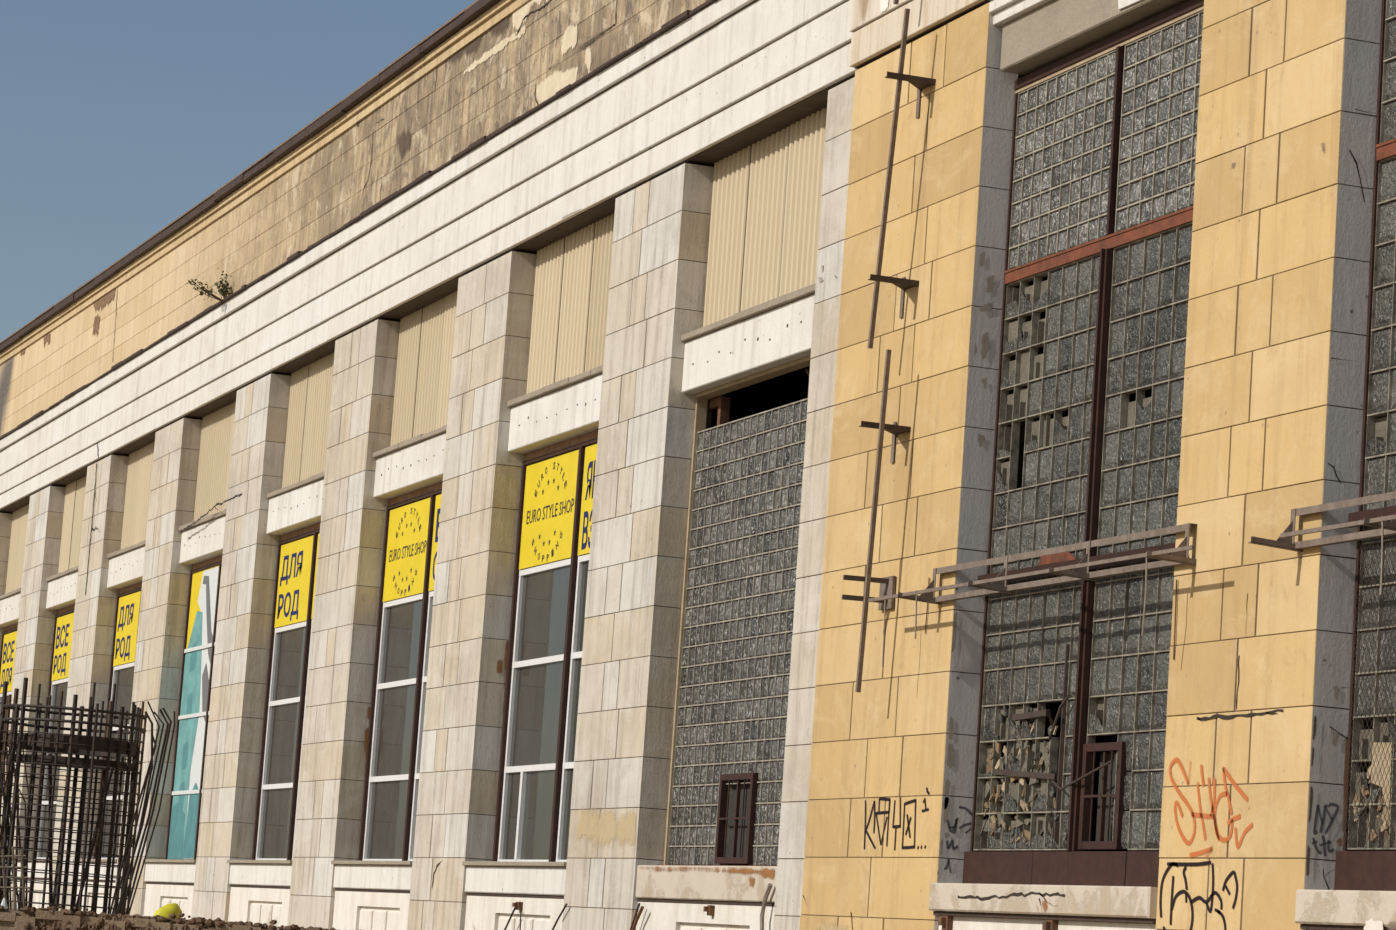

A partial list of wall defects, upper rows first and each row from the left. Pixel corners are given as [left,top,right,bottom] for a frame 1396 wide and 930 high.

water stain [449,17,508,62]
peeling [464,0,548,74]
peeling [536,23,591,104]
water stain [399,131,410,157]
peeling [1363,917,1383,930]